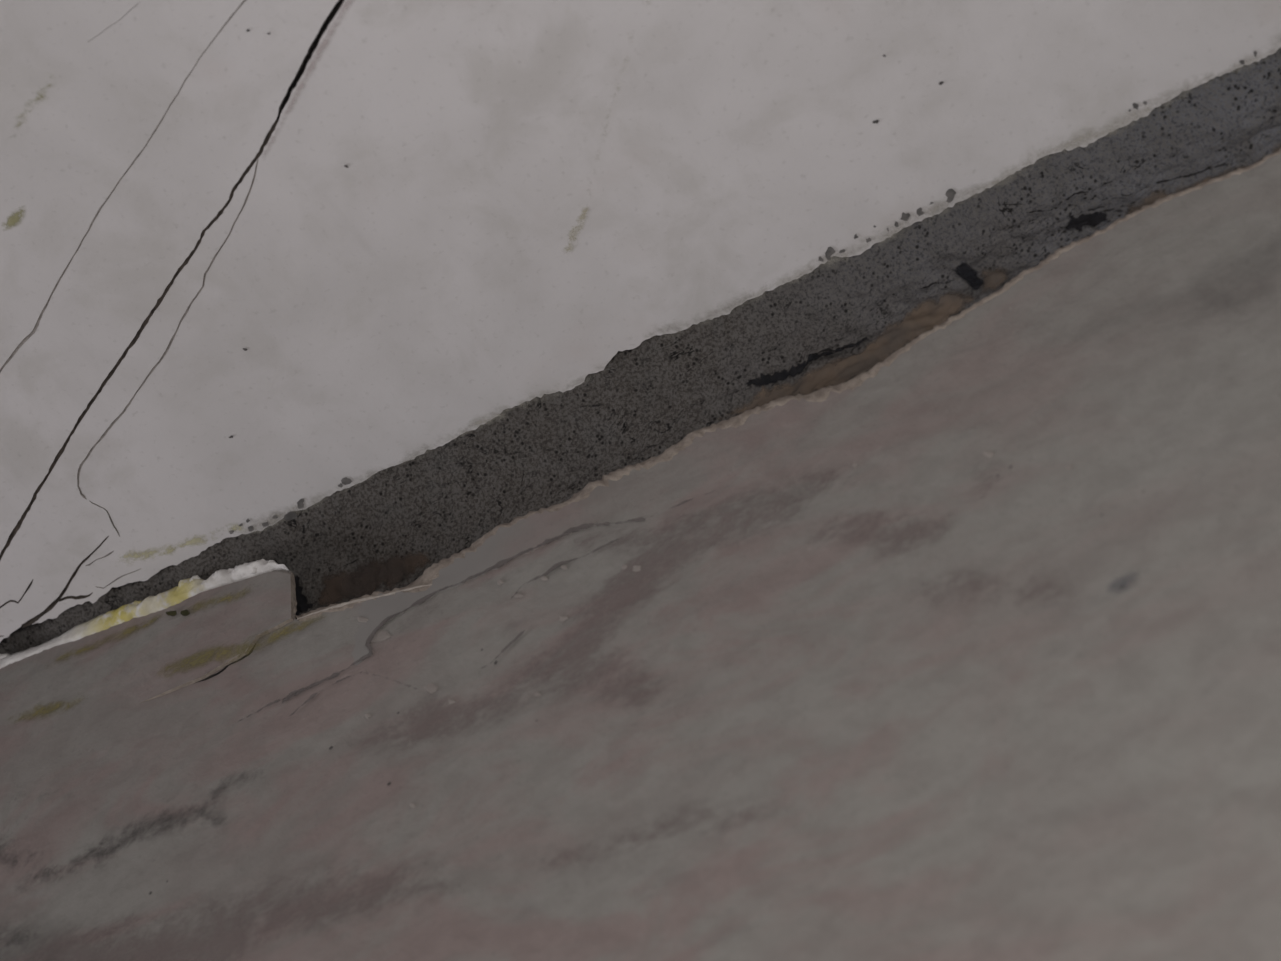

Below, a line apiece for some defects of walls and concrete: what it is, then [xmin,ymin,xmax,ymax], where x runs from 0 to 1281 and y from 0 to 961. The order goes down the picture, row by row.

crack [0,0,349,637]
crack [193,643,256,684]
spalling [0,48,1281,669]